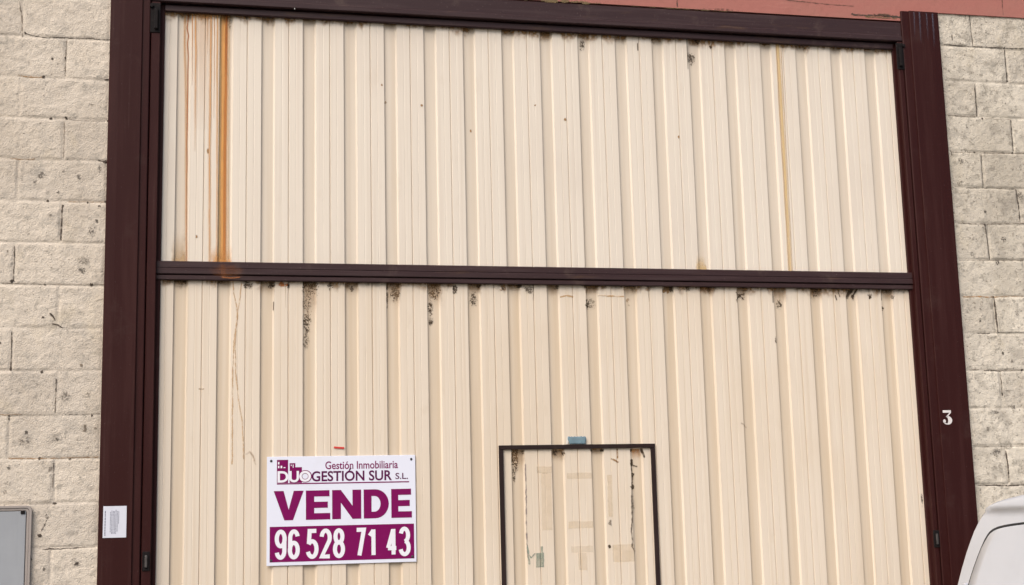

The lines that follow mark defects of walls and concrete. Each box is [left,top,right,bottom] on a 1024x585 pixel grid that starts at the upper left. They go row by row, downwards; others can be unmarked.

rust [184,14,230,262]
leakage [302,282,358,347]
leakage [386,283,485,326]
leakage [736,288,894,311]